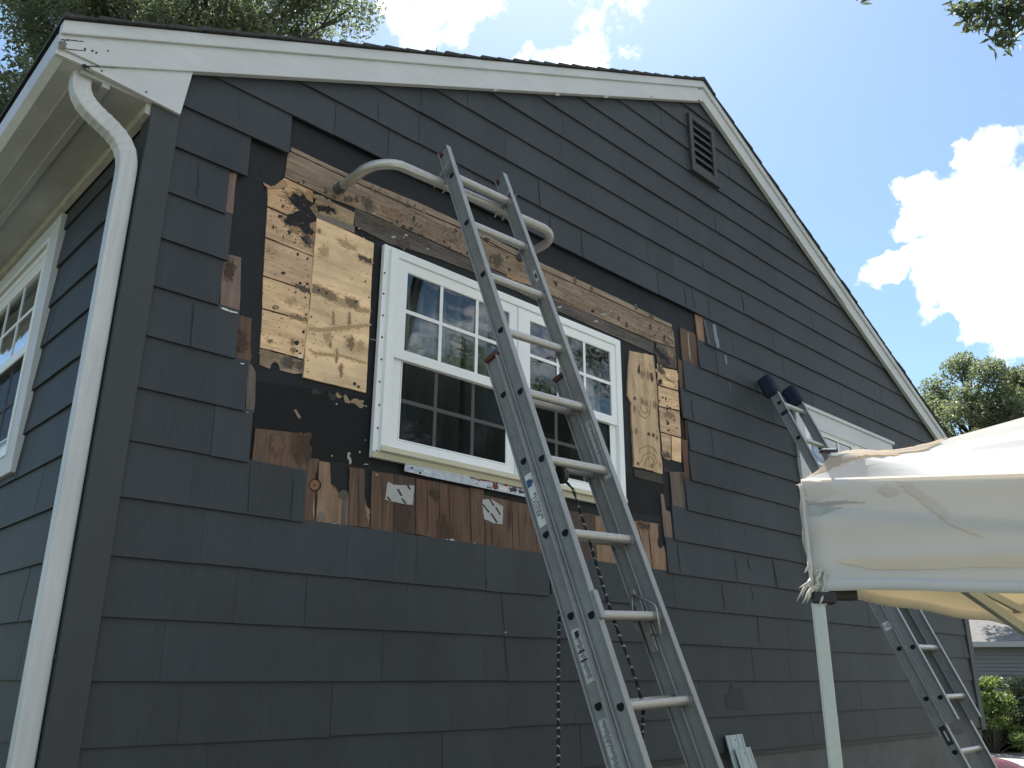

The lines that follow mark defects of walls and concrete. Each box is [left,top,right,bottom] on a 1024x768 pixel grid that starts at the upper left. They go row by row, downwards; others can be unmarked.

water stain [237,162,473,380]
peeling [311,389,367,408]